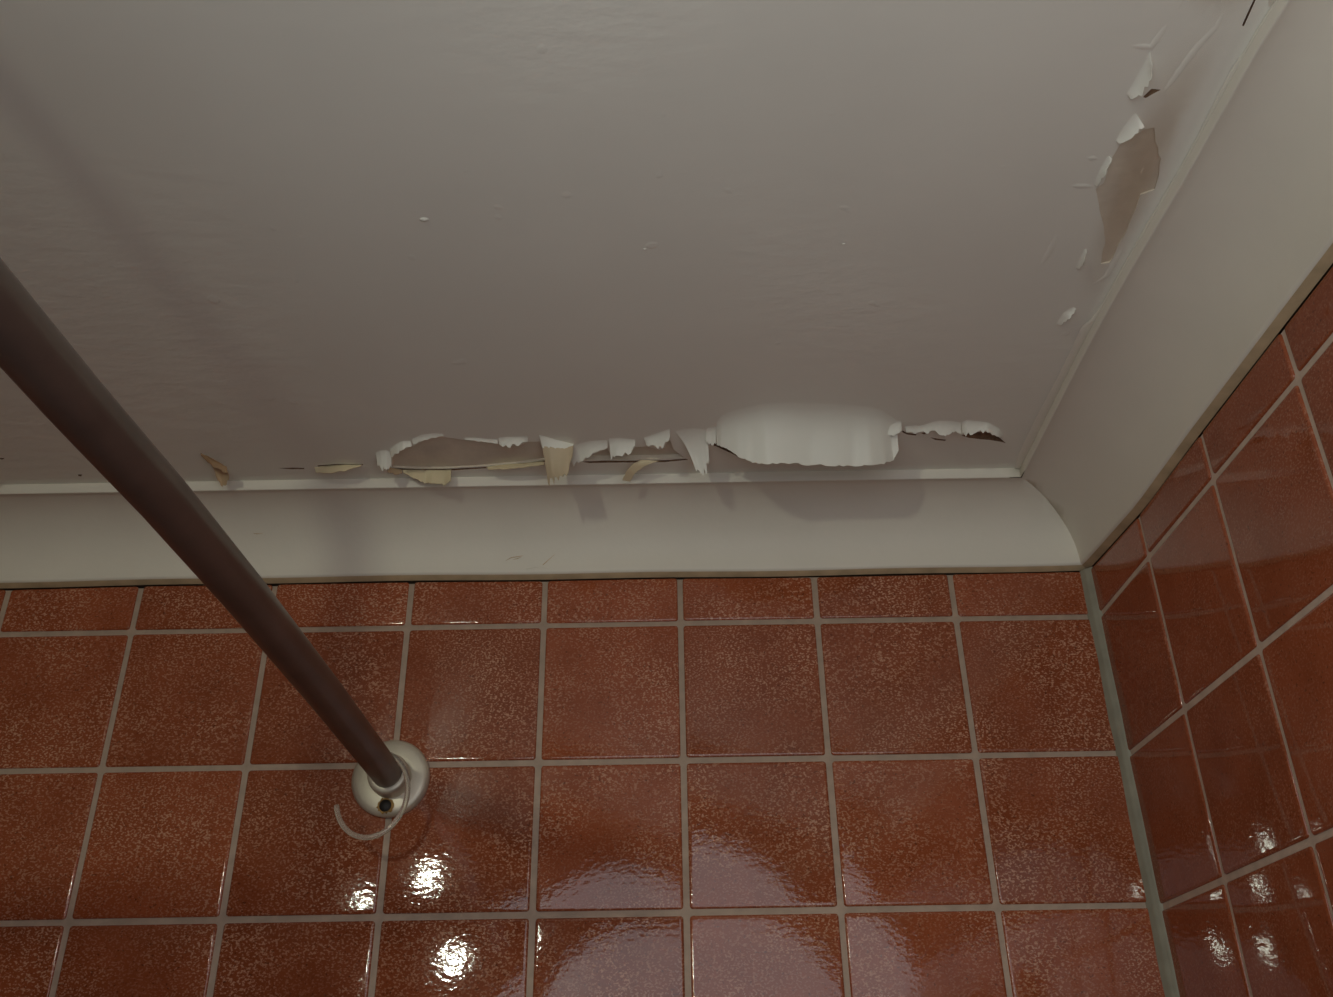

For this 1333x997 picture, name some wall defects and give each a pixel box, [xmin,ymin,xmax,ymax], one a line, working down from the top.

peeling [1076,52,1161,270]
peeling [375,403,1005,486]